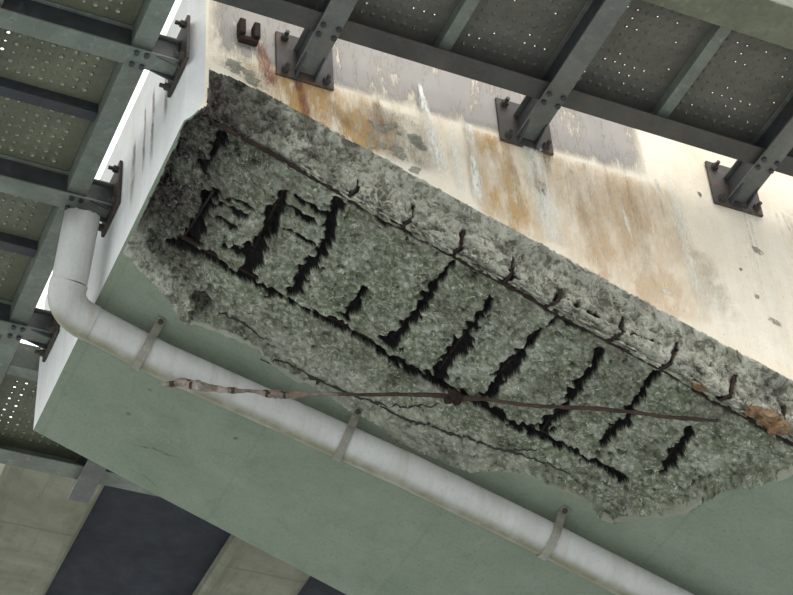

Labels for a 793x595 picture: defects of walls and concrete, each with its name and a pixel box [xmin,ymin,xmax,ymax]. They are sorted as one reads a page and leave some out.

spalling [123,58,793,524]
corrosion [478,132,529,230]